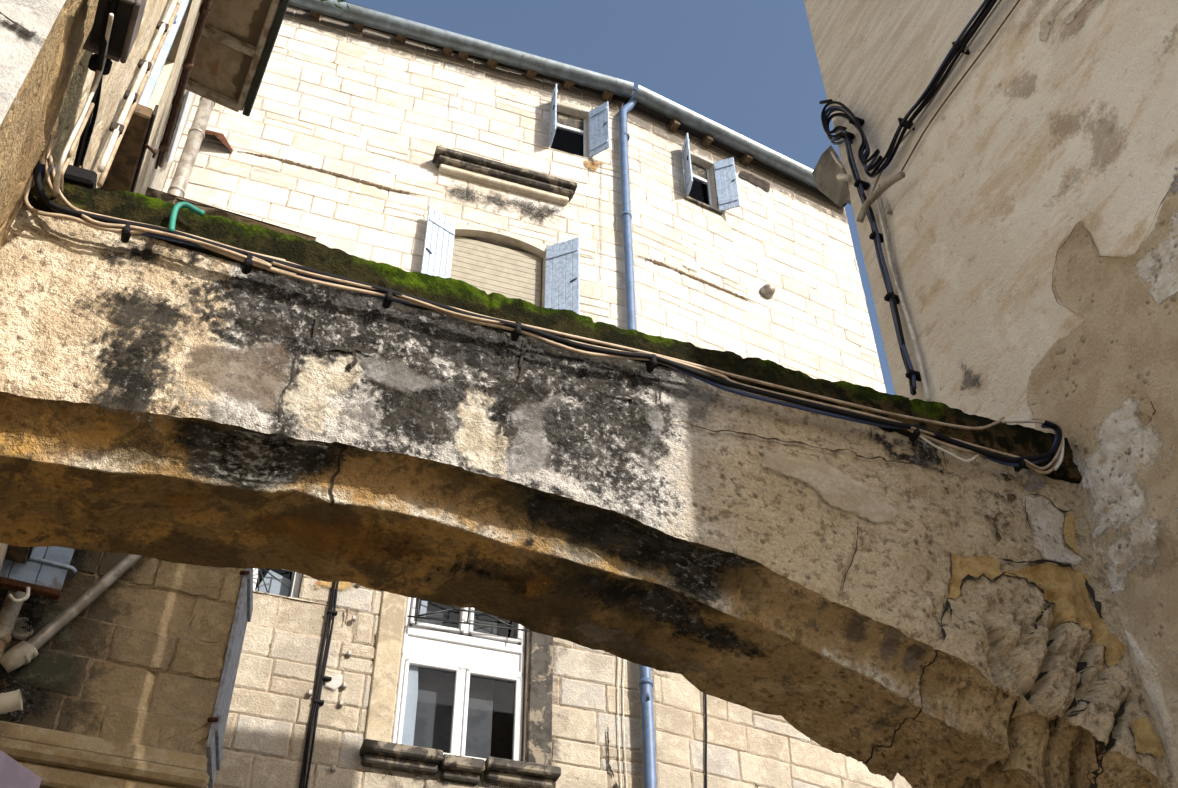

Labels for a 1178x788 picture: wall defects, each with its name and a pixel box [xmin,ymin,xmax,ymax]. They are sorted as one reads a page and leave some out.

water stain [1,20,46,43]
peeling [1040,0,1089,41]
water stain [75,238,720,498]
crack [329,445,347,506]
water stain [871,427,943,473]
crack [1025,494,1071,532]
flaking render [948,168,1178,731]
water stain [512,483,764,662]
crack [863,558,1104,764]
crack [1086,699,1127,788]